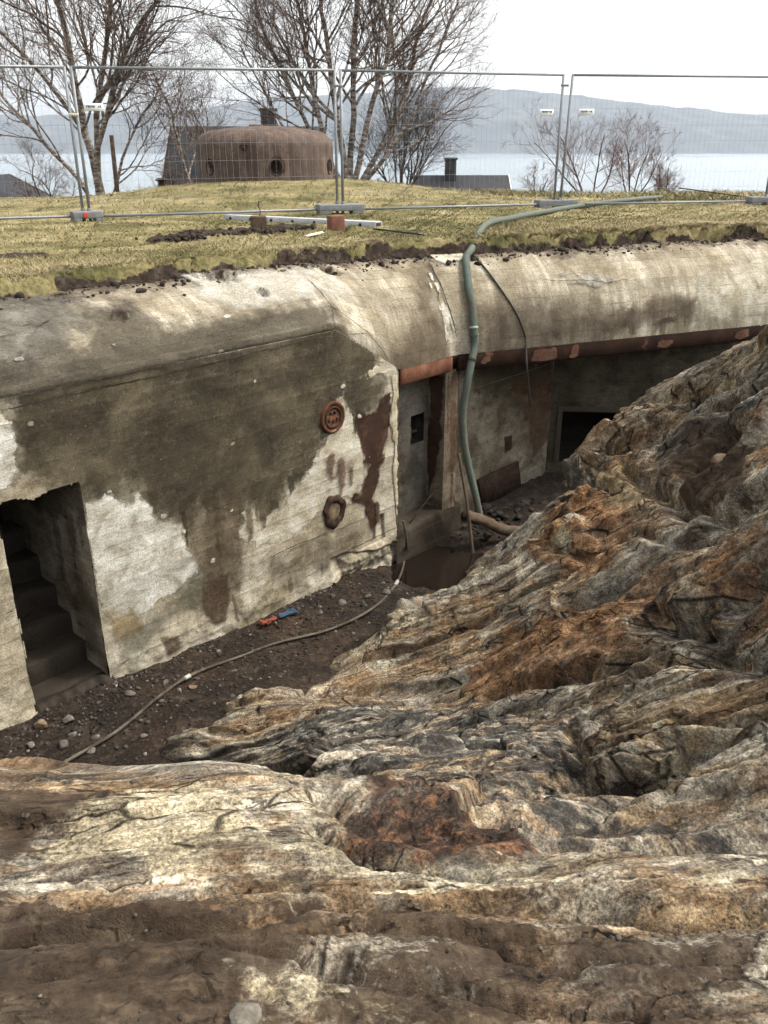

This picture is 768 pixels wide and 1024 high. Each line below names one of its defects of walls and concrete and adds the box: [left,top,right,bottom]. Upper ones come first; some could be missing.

leakage [0,295,385,625]
corrosion [327,393,391,538]
leakage [107,612,181,658]